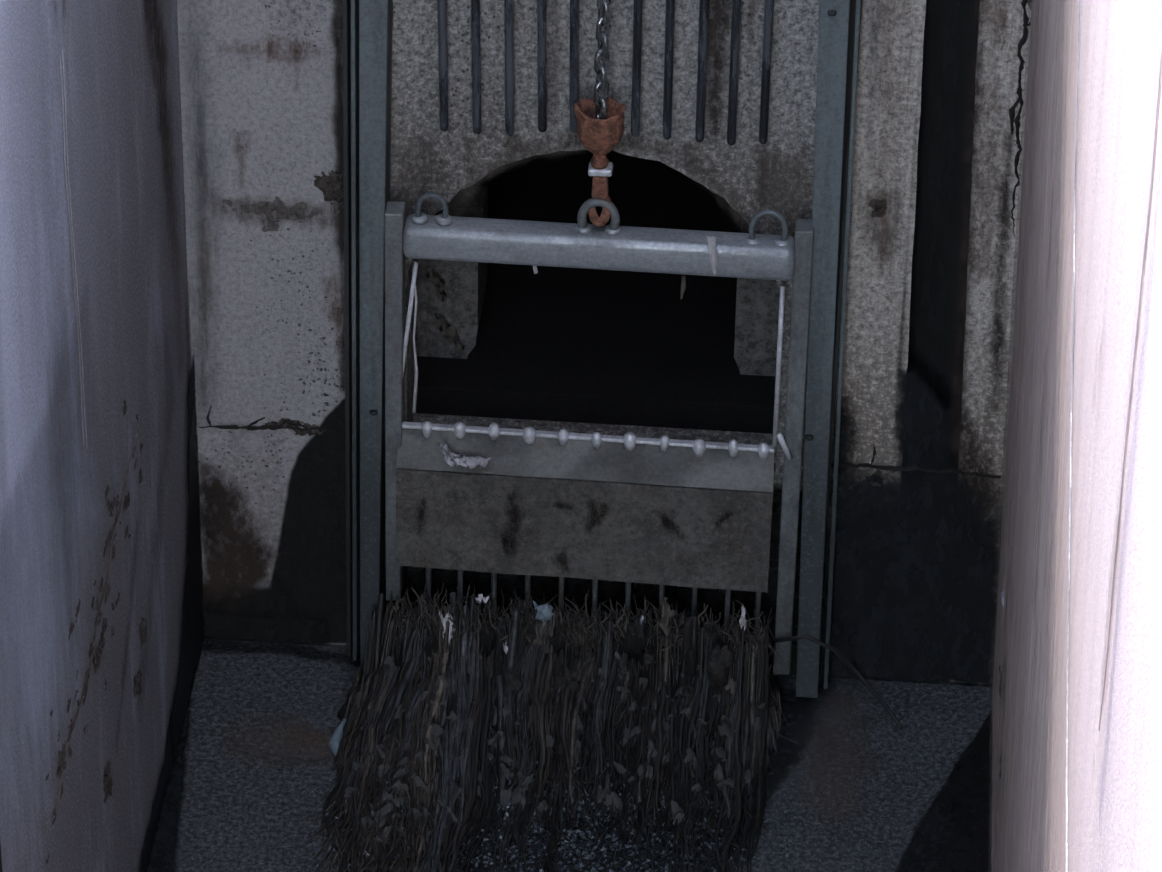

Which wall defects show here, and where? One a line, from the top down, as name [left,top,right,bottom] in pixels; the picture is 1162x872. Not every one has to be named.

damp [139,217,360,872]
damp [259,0,344,258]
damp [383,0,1068,872]
crack [1009,0,1032,237]